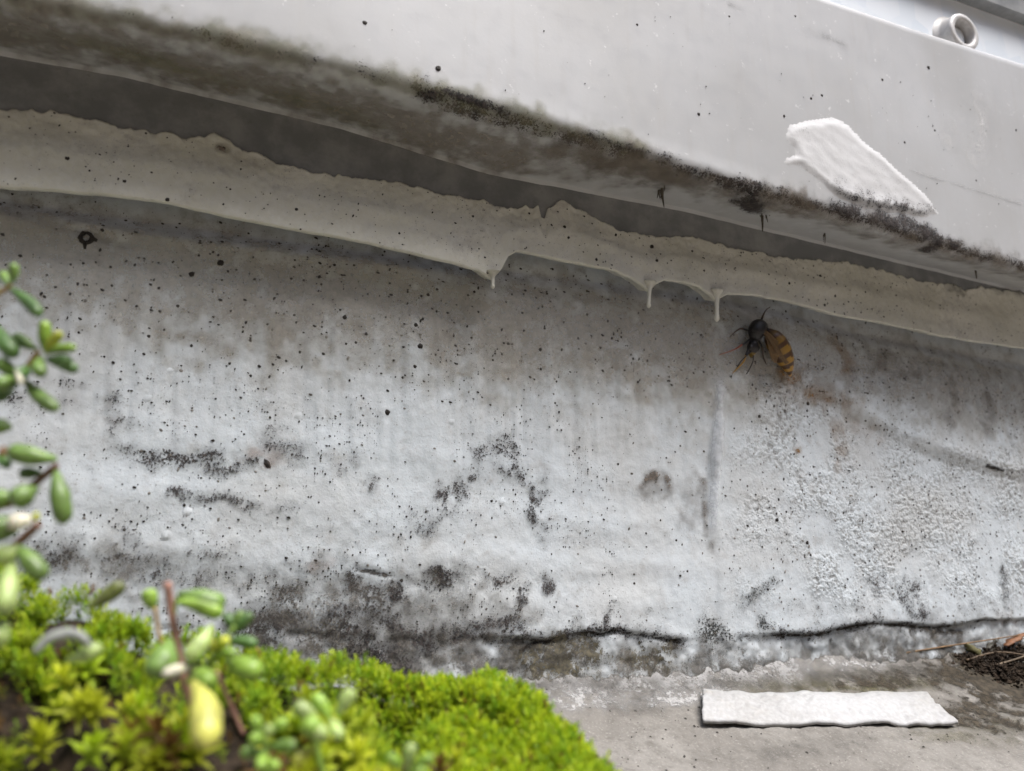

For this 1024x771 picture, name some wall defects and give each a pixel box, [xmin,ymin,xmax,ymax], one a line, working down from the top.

damp [0,9,1024,274]
damp [0,178,1024,528]
damp [18,316,948,675]
crack [438,630,680,652]
crack [741,619,1020,638]